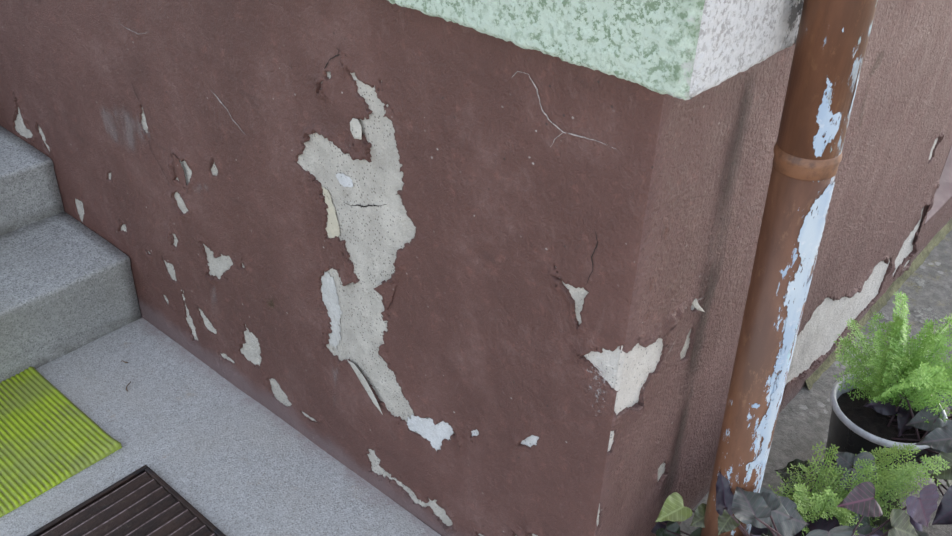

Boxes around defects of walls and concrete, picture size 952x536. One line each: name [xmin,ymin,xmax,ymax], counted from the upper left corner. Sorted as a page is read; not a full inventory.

crack [512,71,615,149]
peeling [297,72,455,451]
peeling [746,182,930,471]
peeling [584,338,663,415]
peeling [367,449,453,526]